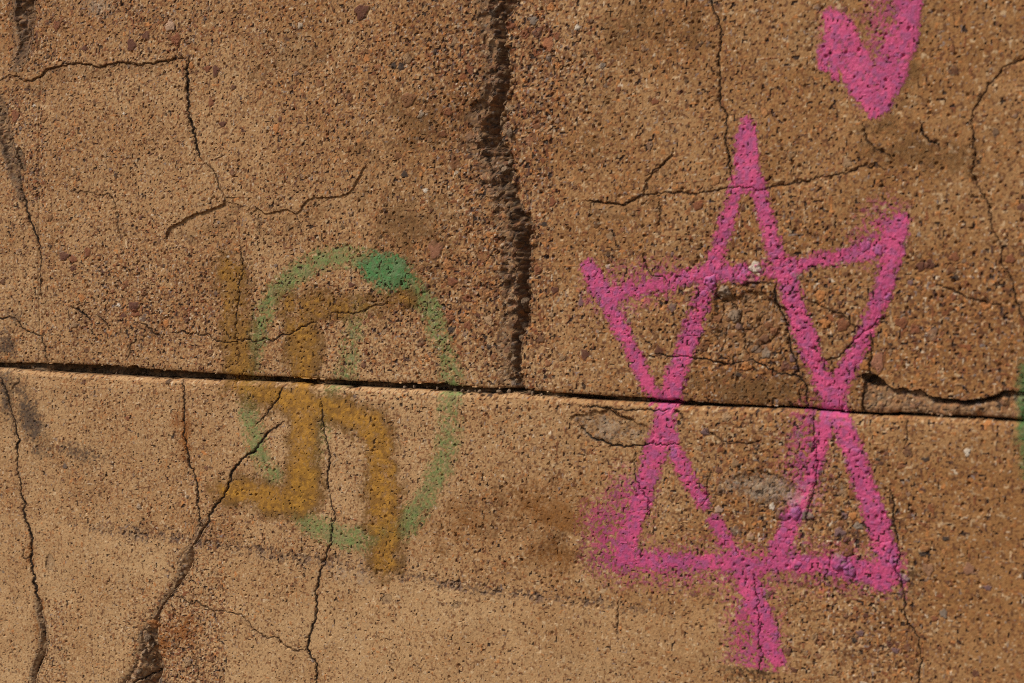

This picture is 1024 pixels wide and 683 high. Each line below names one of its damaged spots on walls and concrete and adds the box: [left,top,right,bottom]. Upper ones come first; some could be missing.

crack [18,170,42,296]
crack [2,58,223,192]
crack [464,0,535,389]
crack [587,0,894,223]
crack [941,59,1024,318]
crack [1,377,47,672]
crack [159,383,336,683]
crack [657,282,889,520]